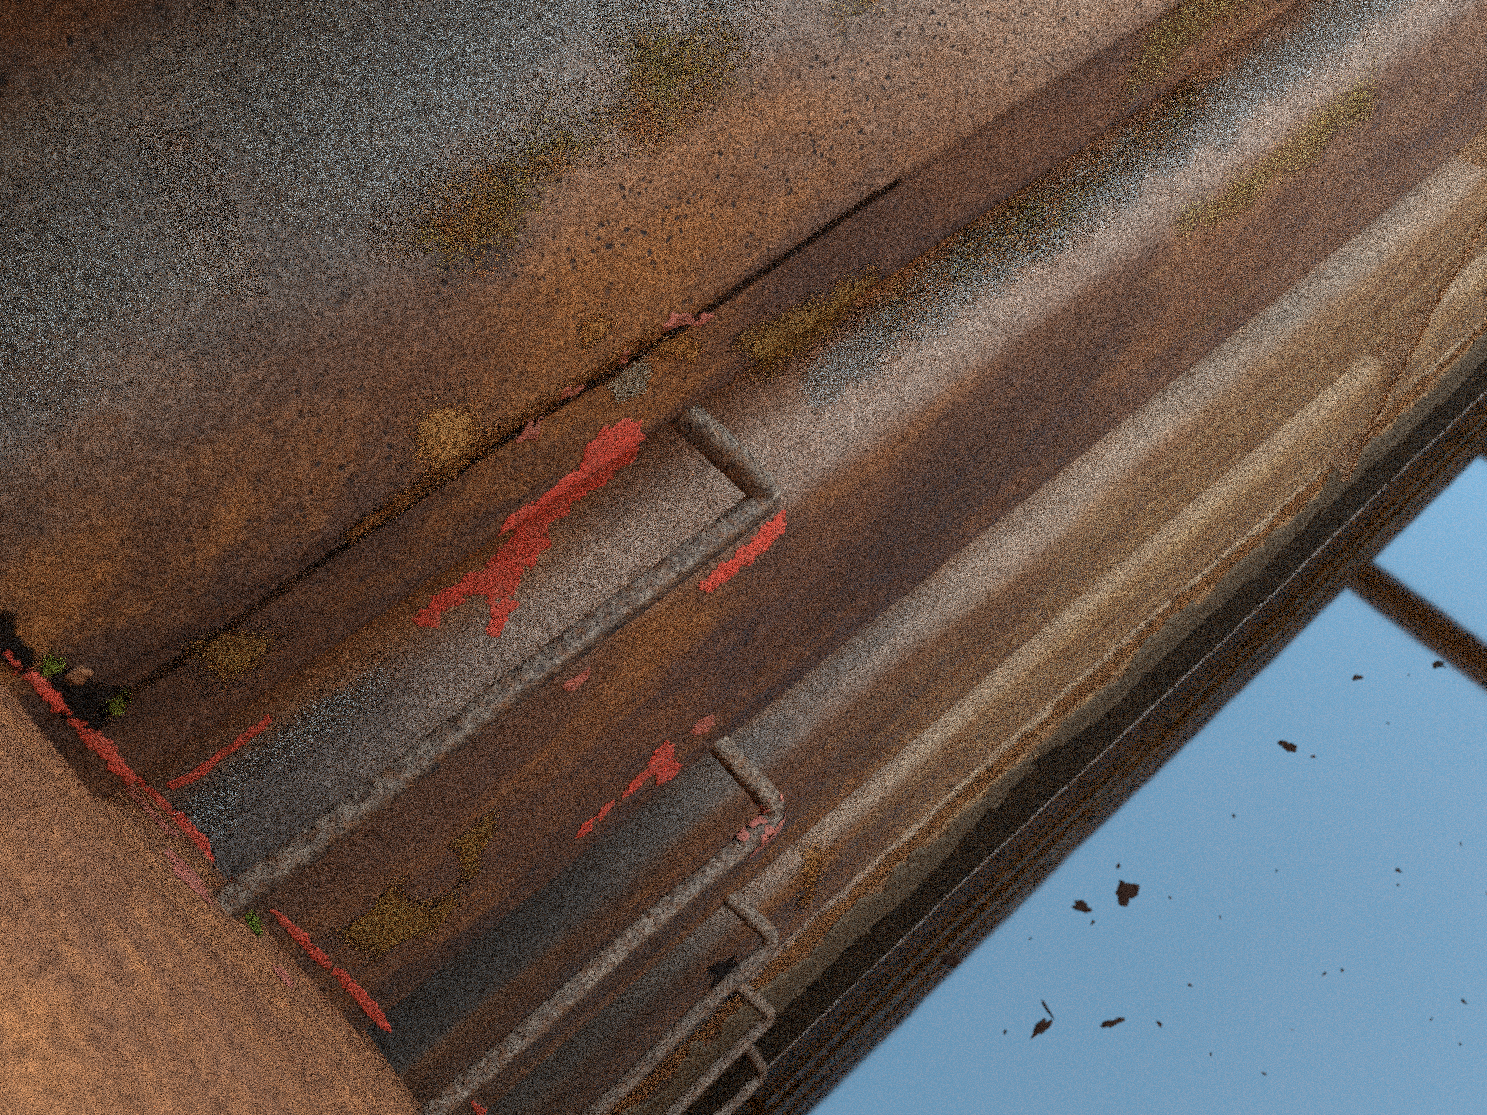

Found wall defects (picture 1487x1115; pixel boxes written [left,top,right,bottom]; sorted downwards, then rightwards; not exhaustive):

peeling [559,384,588,401]
peeling [663,312,715,331]
rust [1364,318,1487,446]
peeling [412,414,646,638]
rust [63,666,93,685]
peeling [2,650,272,907]
rust [188,631,273,677]
peeling [575,740,683,838]
rust [607,467,1334,1115]
peeling [619,332,1487,1115]
peeling [269,909,392,1033]
peeling [470,1100,488,1115]